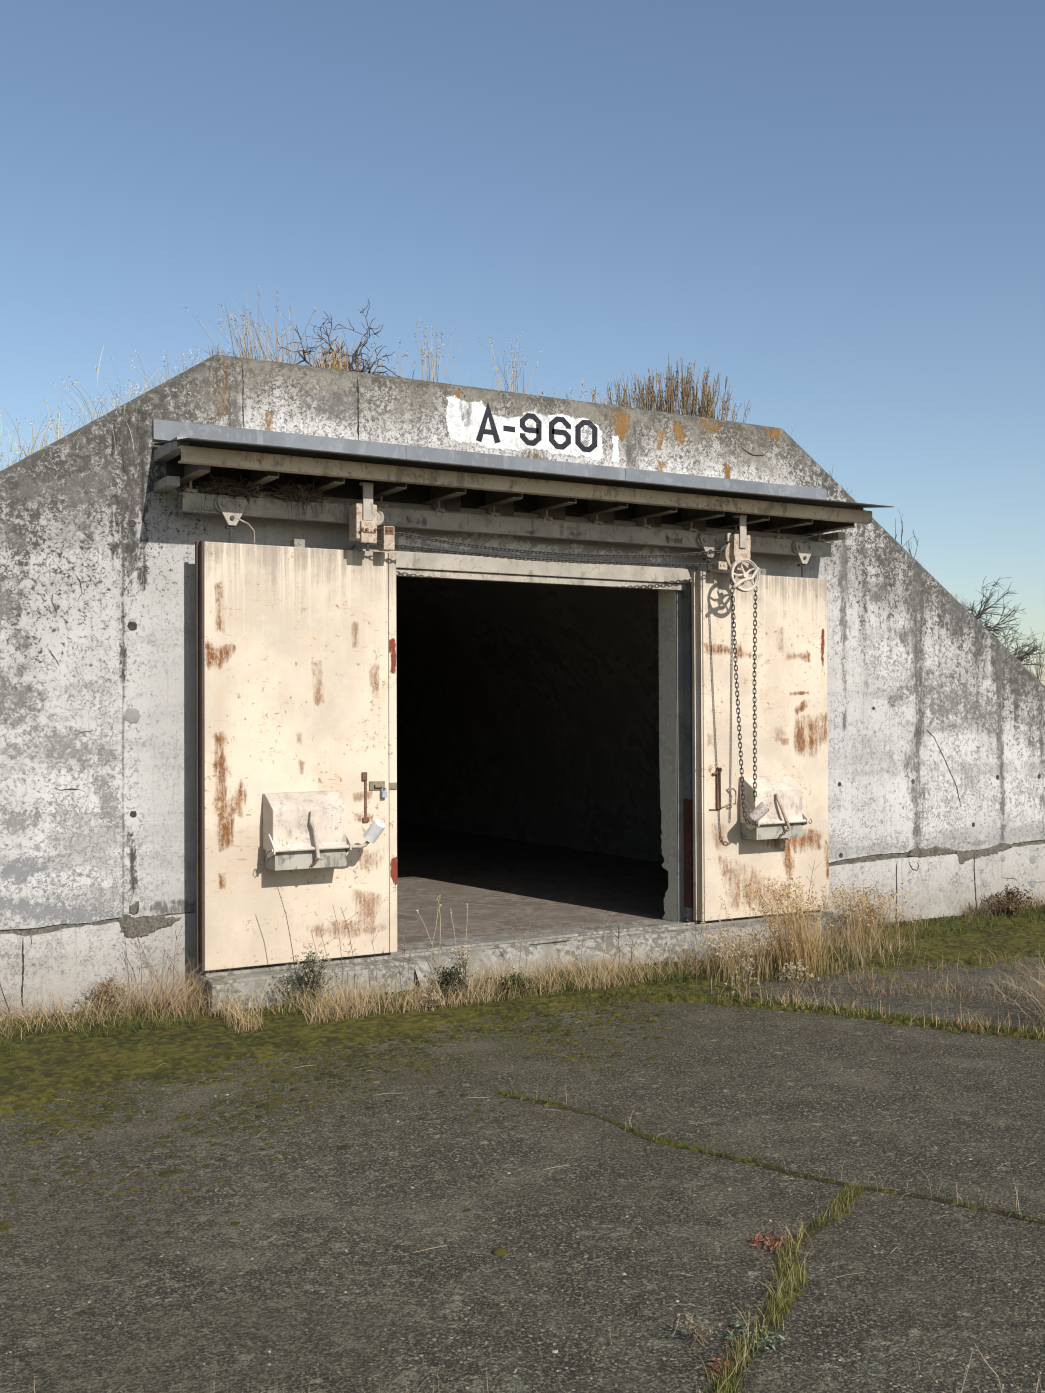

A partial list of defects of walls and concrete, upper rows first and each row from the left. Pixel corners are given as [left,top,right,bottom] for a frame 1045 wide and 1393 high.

damp [837,529,850,691]
rust [206,644,235,667]
rust [781,691,827,752]
damp [889,563,1009,844]
damp [1021,695,1045,776]
rust [214,733,246,847]
rust [316,894,375,934]
crack [829,840,1045,920]
crack [0,912,194,1006]